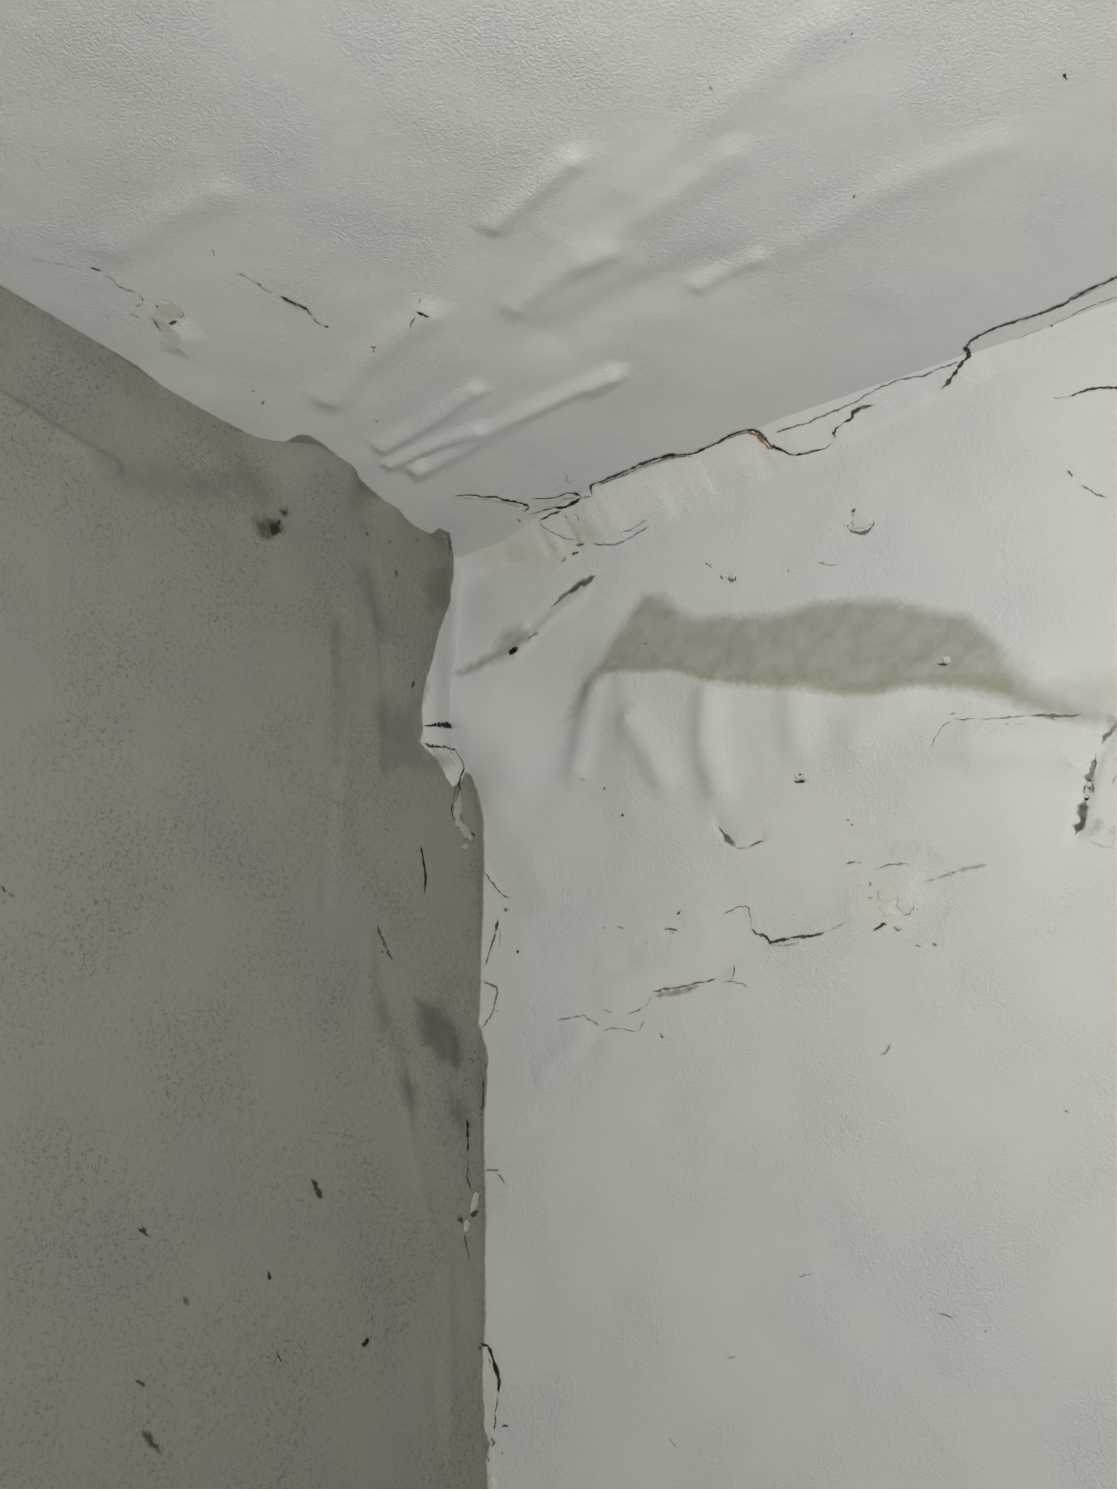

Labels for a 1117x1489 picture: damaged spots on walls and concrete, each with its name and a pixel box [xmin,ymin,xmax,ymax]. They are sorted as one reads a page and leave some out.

crack [212,251,328,328]
crack [457,276,1117,562]
water stain [562,589,1117,733]
crack [726,906,824,945]
crack [559,966,747,1031]
peeling [483,1346,503,1489]